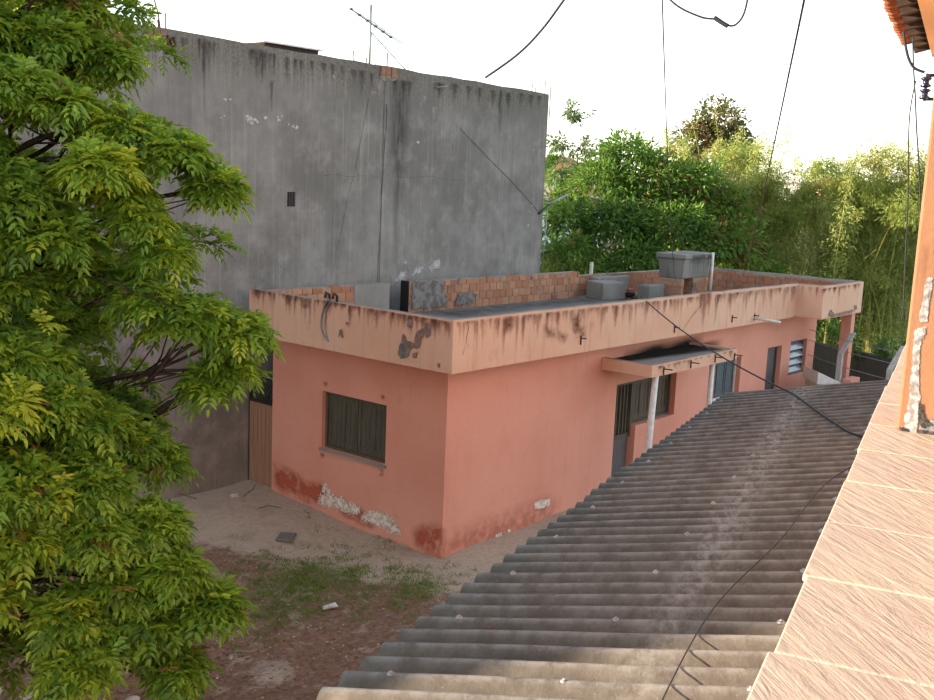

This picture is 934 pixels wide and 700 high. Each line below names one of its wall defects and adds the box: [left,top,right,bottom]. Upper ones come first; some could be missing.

leakage [323,301,453,327]
peeling [395,258,479,359]
leakage [615,339,732,368]
peeling [899,277,934,435]
leakage [276,471,402,536]